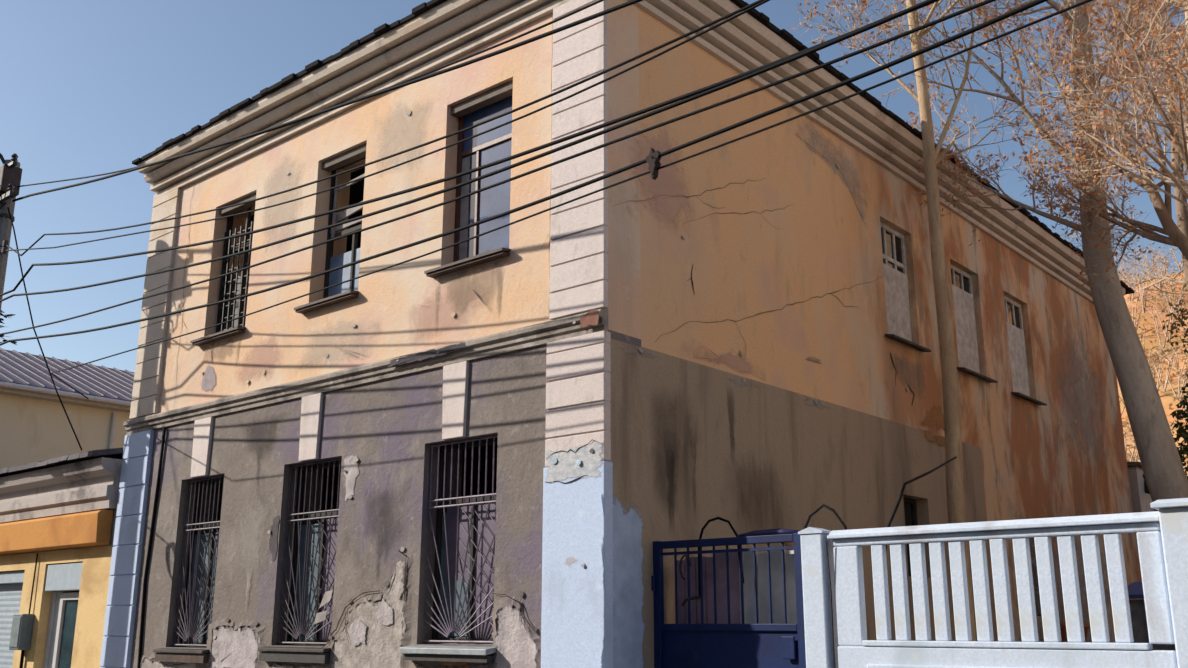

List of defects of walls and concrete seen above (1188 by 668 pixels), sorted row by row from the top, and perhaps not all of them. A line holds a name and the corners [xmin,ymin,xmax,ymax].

crack [614,179,777,229]
crack [655,266,883,354]
peeling [343,455,359,501]
peeling [545,439,603,483]
spalling [136,546,541,668]